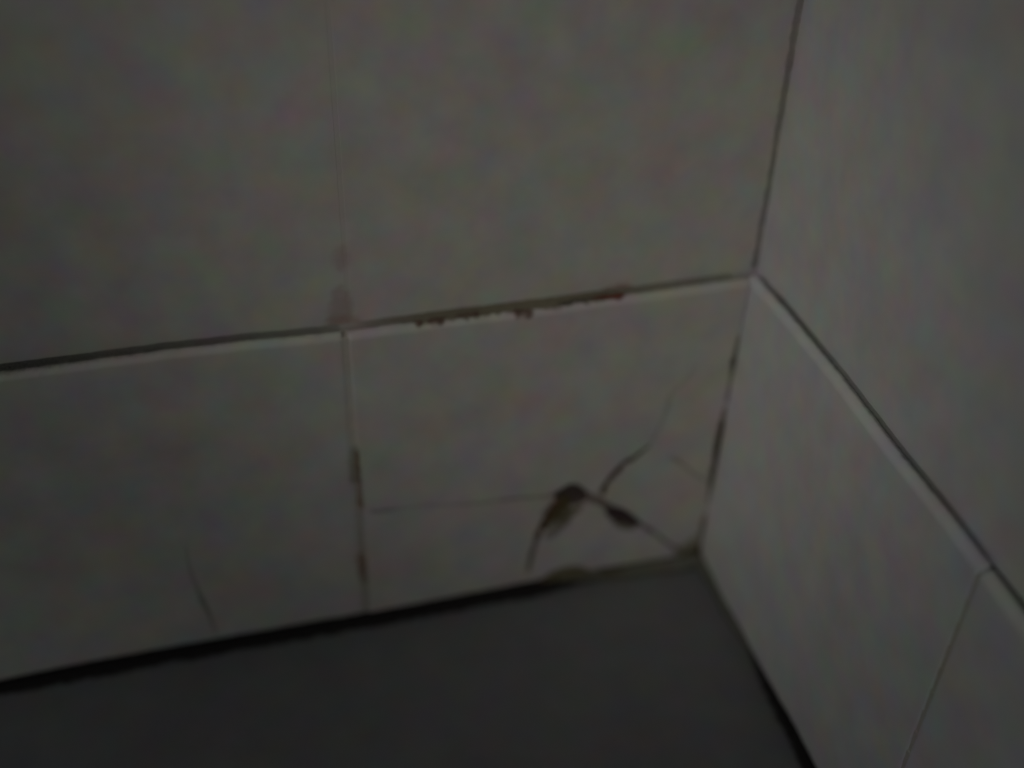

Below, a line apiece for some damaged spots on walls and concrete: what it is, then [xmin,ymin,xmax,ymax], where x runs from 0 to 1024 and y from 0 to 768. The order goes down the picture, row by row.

crack [587,446,649,508]